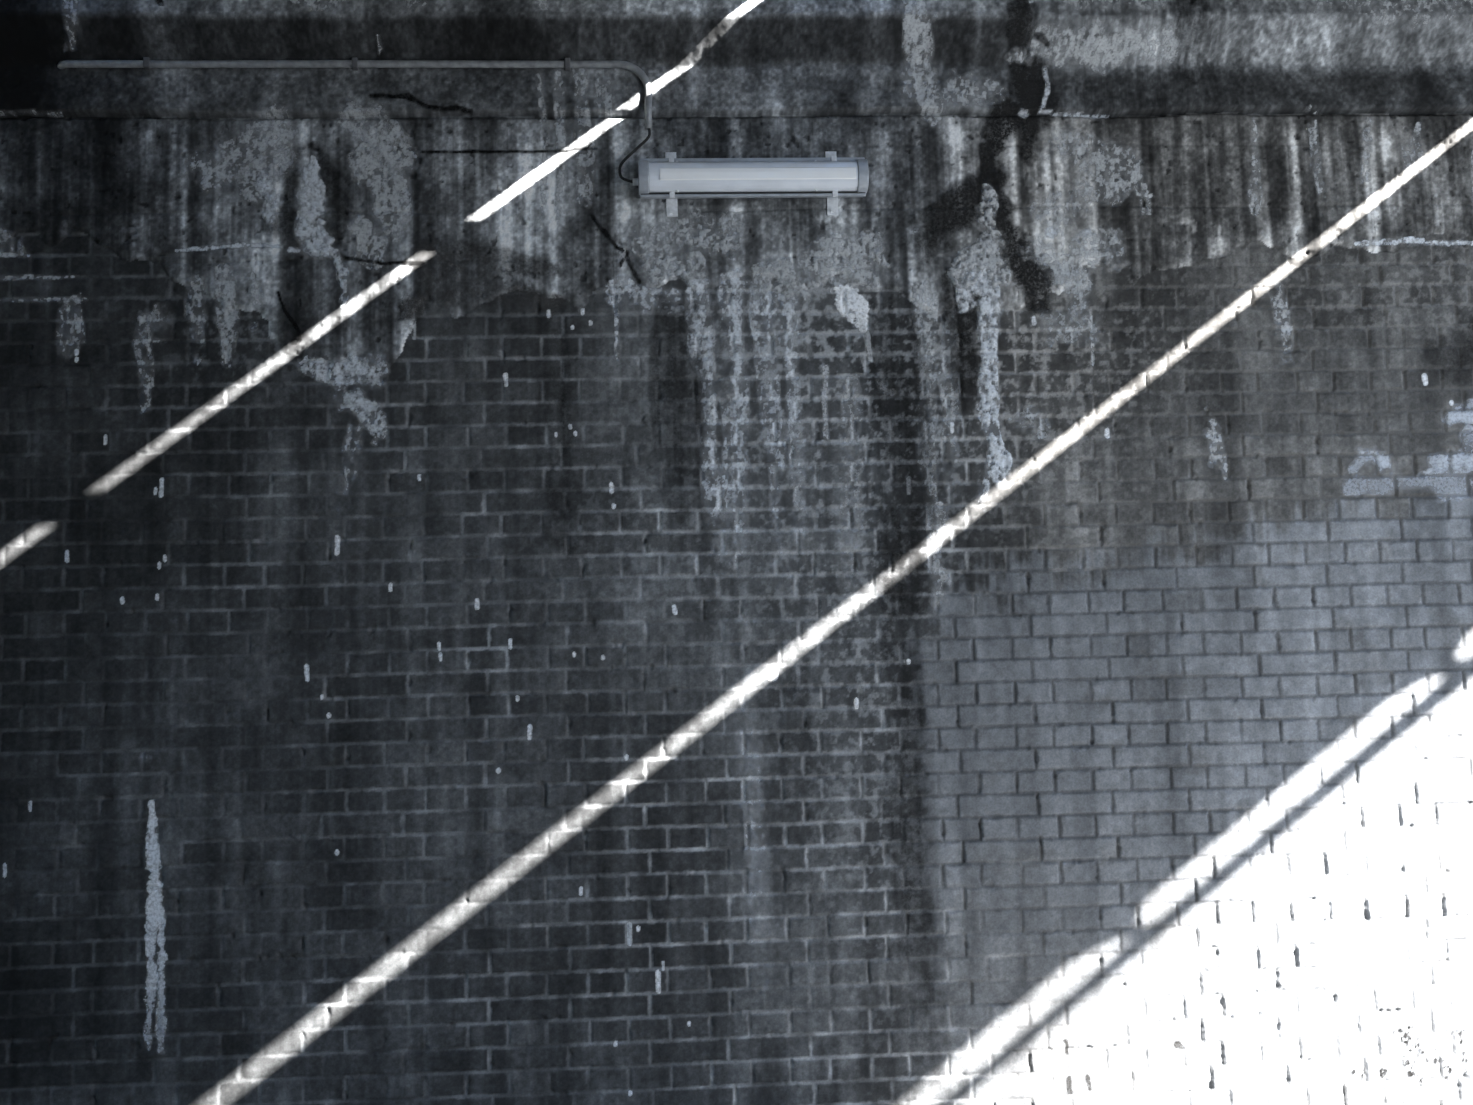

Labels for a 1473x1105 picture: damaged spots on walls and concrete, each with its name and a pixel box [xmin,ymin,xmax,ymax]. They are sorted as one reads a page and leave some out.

spalling [268,143,349,242]
damp [1248,120,1261,216]
damp [1308,113,1323,193]
damp [1402,122,1422,174]
damp [1354,236,1473,246]
damp [606,0,1152,604]
damp [1272,286,1293,350]
damp [1206,420,1228,480]
damp [145,800,168,1034]